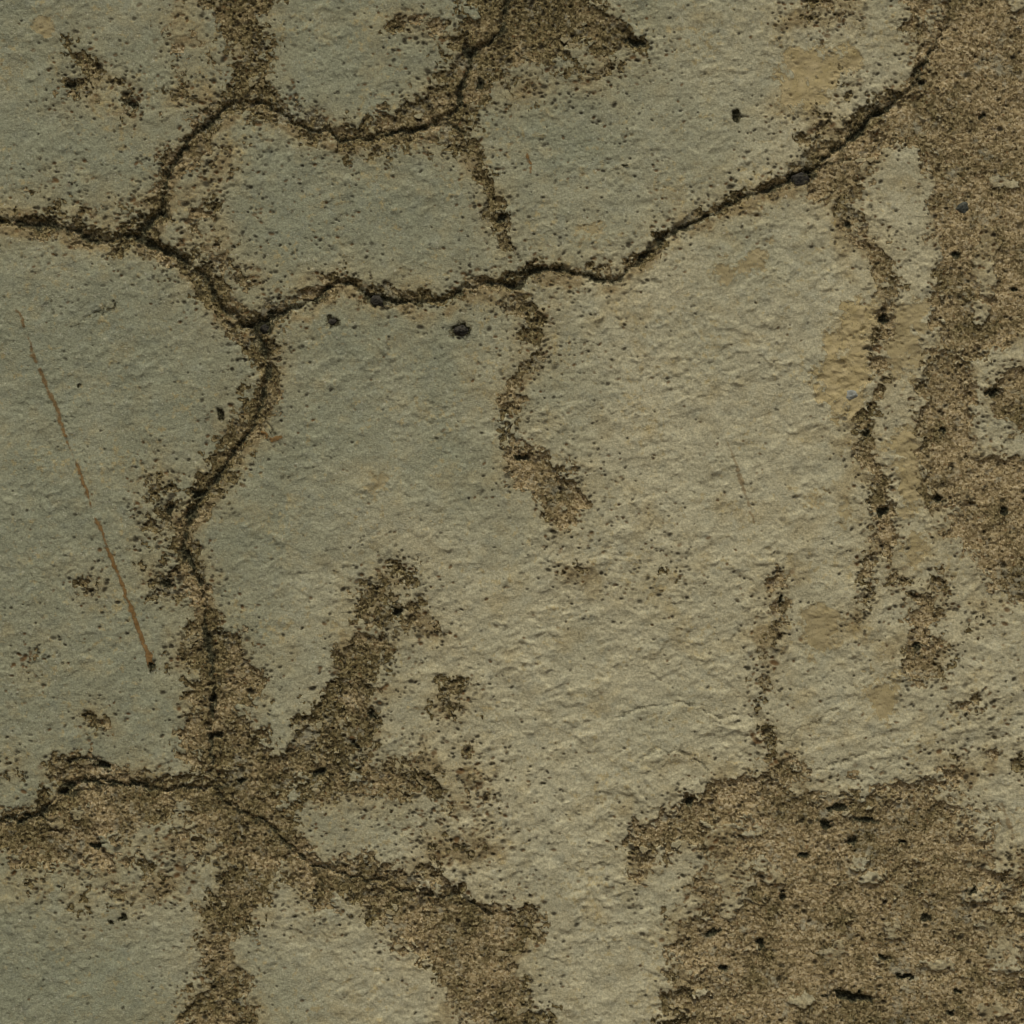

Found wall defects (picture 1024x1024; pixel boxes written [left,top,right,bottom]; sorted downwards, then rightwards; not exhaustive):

flaking render [335,0,654,257]
rust [31,344,69,444]
crack [0,0,947,768]
flaking render [495,289,593,532]
flaking render [806,0,1024,729]
rust [94,518,154,665]
crack [0,757,495,915]
flaking render [0,556,565,1024]
flaking render [615,564,1024,1024]